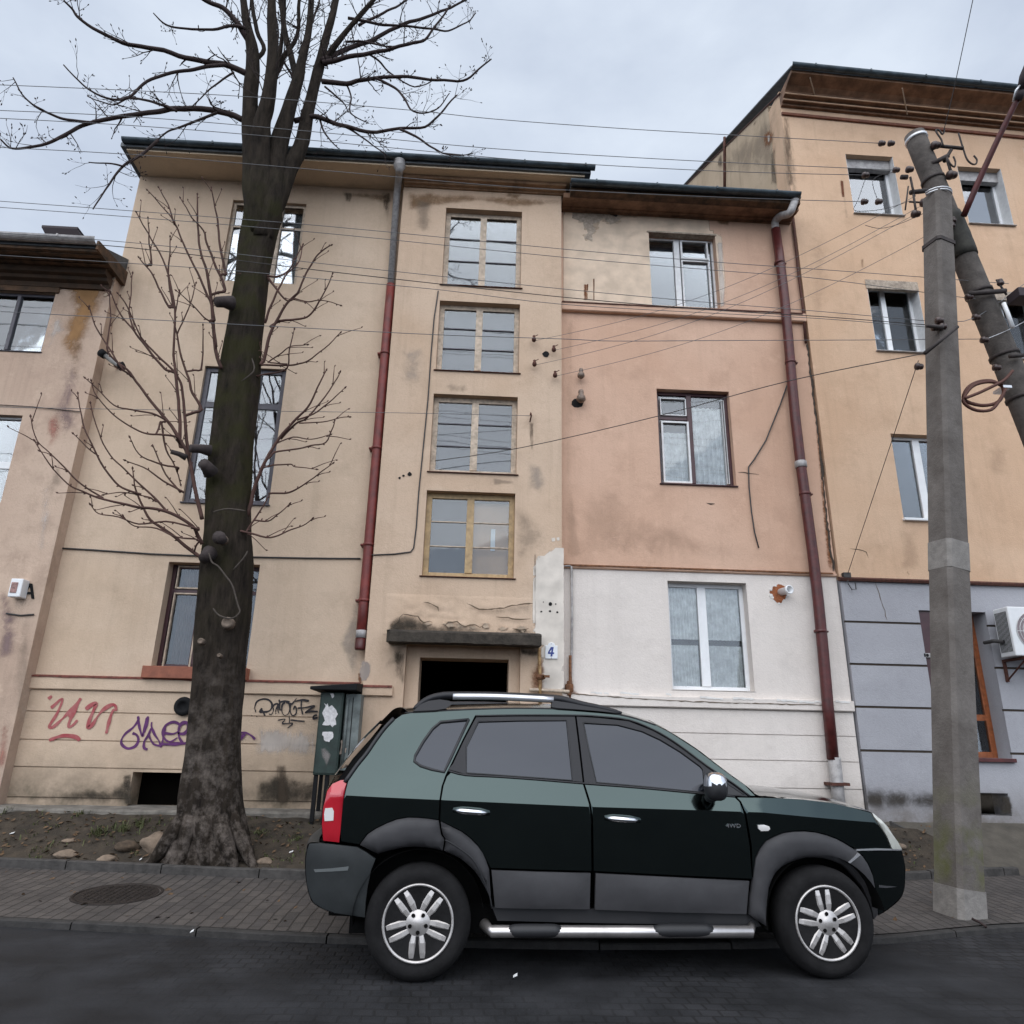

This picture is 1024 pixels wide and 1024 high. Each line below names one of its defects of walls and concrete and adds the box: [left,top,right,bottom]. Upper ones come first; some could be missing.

leakage [412,194,472,206]
leakage [65,289,99,349]
leakage [260,767,312,802]